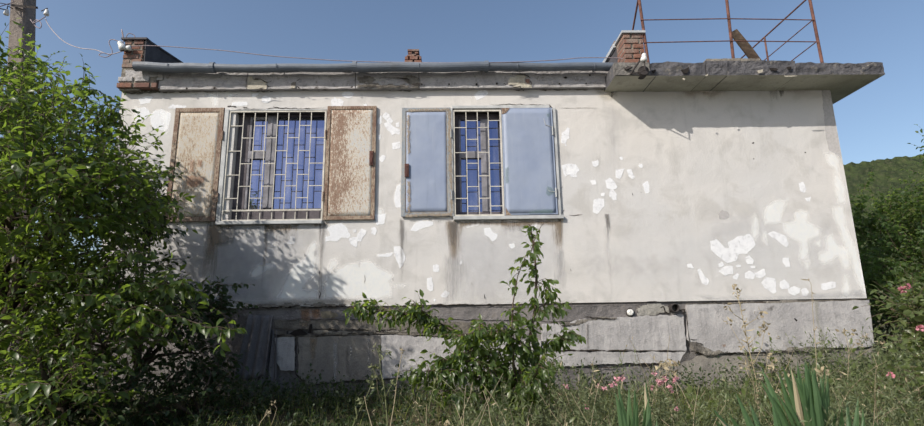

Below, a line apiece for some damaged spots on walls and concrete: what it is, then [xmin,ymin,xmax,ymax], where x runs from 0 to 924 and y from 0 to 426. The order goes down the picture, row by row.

spalling [331,75,423,106]
peeling [561,127,570,146]
rust [186,160,204,187]
peeling [561,164,579,177]
peeling [590,157,649,214]
peeling [325,214,386,256]
peeling [378,246,405,268]
peeling [687,263,709,285]
peeling [710,231,809,303]